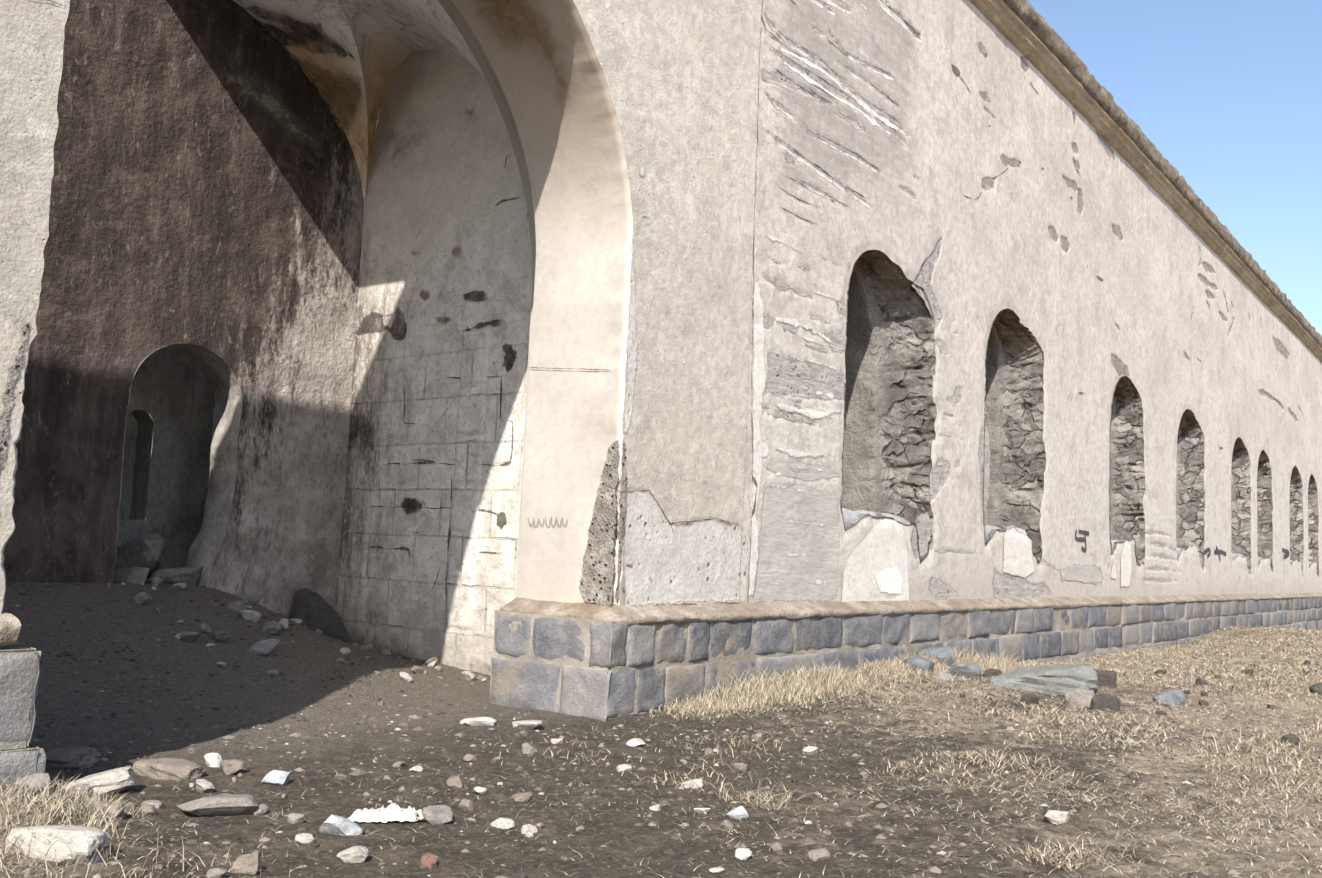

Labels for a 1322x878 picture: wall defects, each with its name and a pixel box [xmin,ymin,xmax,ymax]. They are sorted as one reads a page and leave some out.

leakage [242,6,355,60]
crack [756,0,778,157]
flaking render [762,11,911,177]
flaking render [791,0,928,47]
flaking render [765,128,870,224]
flaking render [964,154,1021,199]
flaking render [1048,226,1069,253]
flaking render [1063,112,1084,214]
spalling [0,323,30,469]
crack [608,190,758,605]
flaking render [762,300,846,426]
flaking render [579,438,840,606]